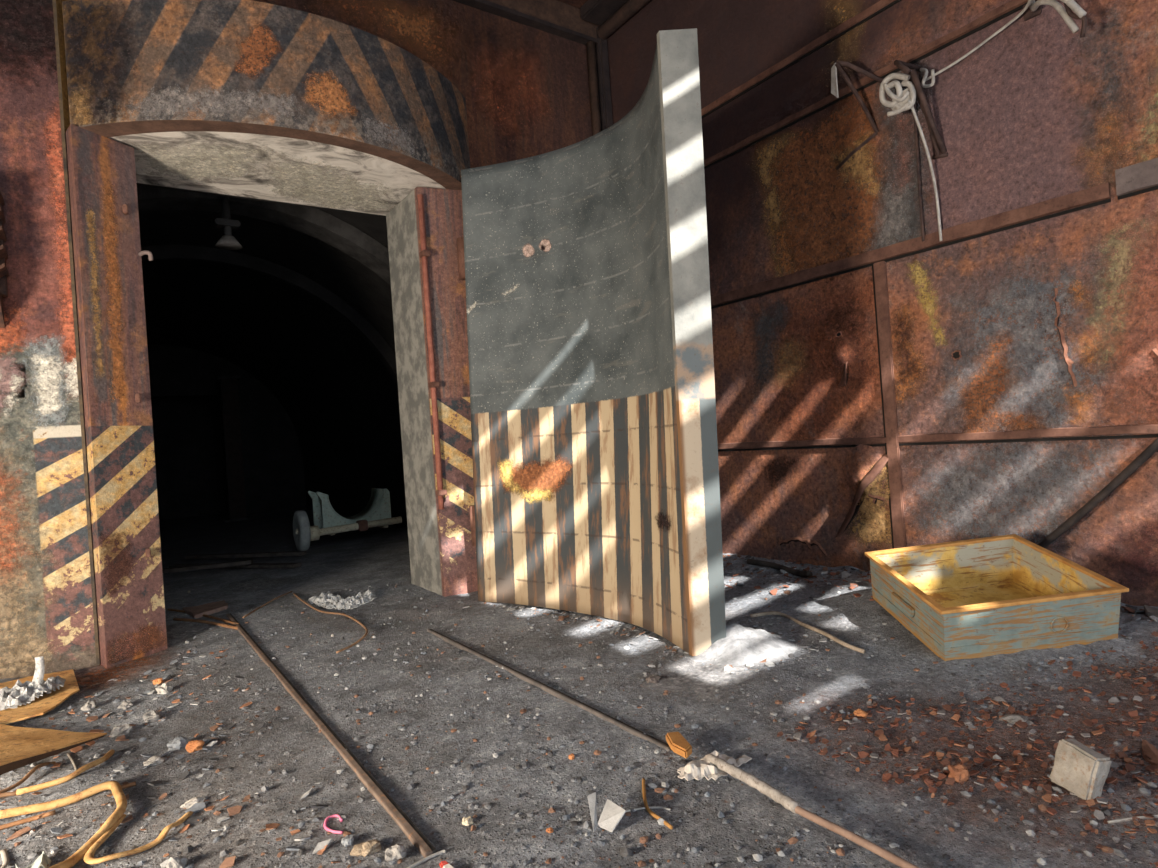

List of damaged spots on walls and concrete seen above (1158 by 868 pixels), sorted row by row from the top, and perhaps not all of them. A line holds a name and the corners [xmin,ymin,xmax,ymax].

rust [236,23,283,77]
rust [305,73,356,119]
rust [46,113,78,397]
rust [86,187,124,399]
rust [892,306,923,401]
rust [960,335,1046,433]
rust [1117,238,1158,424]
rust [850,464,892,546]